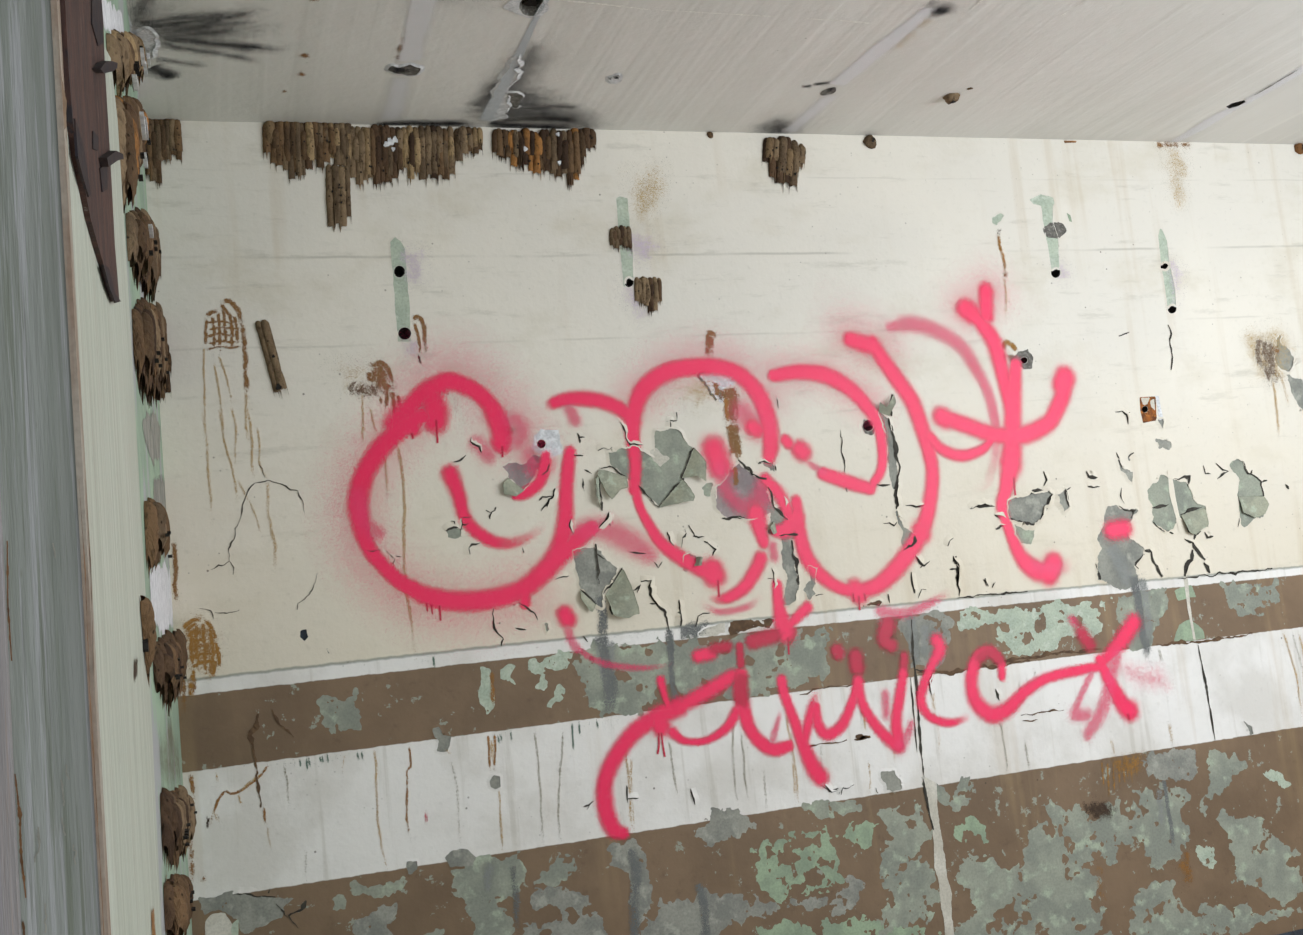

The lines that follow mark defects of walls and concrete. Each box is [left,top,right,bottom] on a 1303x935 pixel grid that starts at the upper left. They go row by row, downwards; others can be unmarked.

flaking render [102,0,161,59]
corrosion [1255,339,1288,430]
corrosion [201,298,278,565]
peeling [150,553,173,635]
crack [214,465,304,573]
peeling [478,425,833,718]
peeling [898,454,1210,669]
peeling [1227,455,1269,527]
peeling [606,748,1303,935]
peeling [198,891,294,935]
peeling [332,858,420,935]
peeling [443,849,608,935]